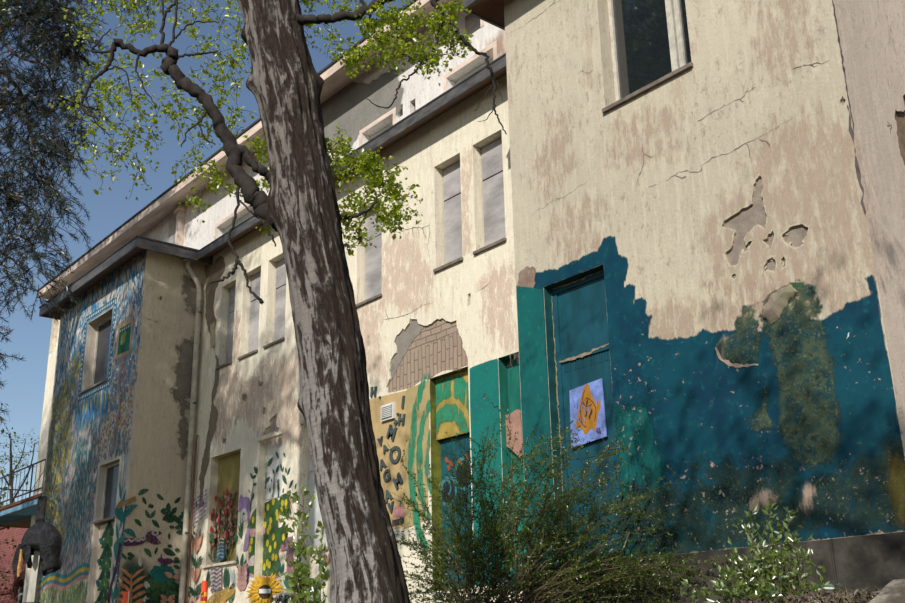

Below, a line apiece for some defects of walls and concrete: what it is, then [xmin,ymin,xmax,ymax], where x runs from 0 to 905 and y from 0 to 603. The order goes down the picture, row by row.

crack [635,118,792,191]
flaking render [895,97,905,165]
flaking render [357,231,468,393]